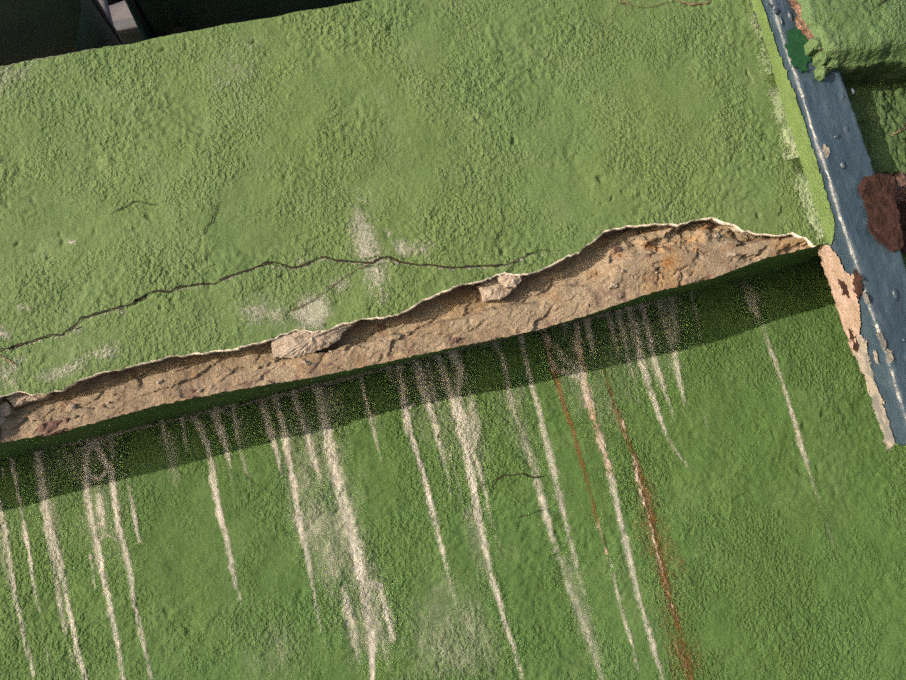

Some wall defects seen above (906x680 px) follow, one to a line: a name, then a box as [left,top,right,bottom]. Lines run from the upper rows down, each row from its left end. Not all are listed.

crack [0,228,561,366]
efflorescence [349,200,388,304]
efflorescence [388,233,432,255]
spalling [0,85,895,451]
rust [857,171,906,254]
damp [1,457,21,504]
damp [0,500,29,656]
damp [22,522,36,591]
damp [35,293,685,680]
rust [541,328,587,481]
rust [609,389,680,629]
damp [783,387,809,470]